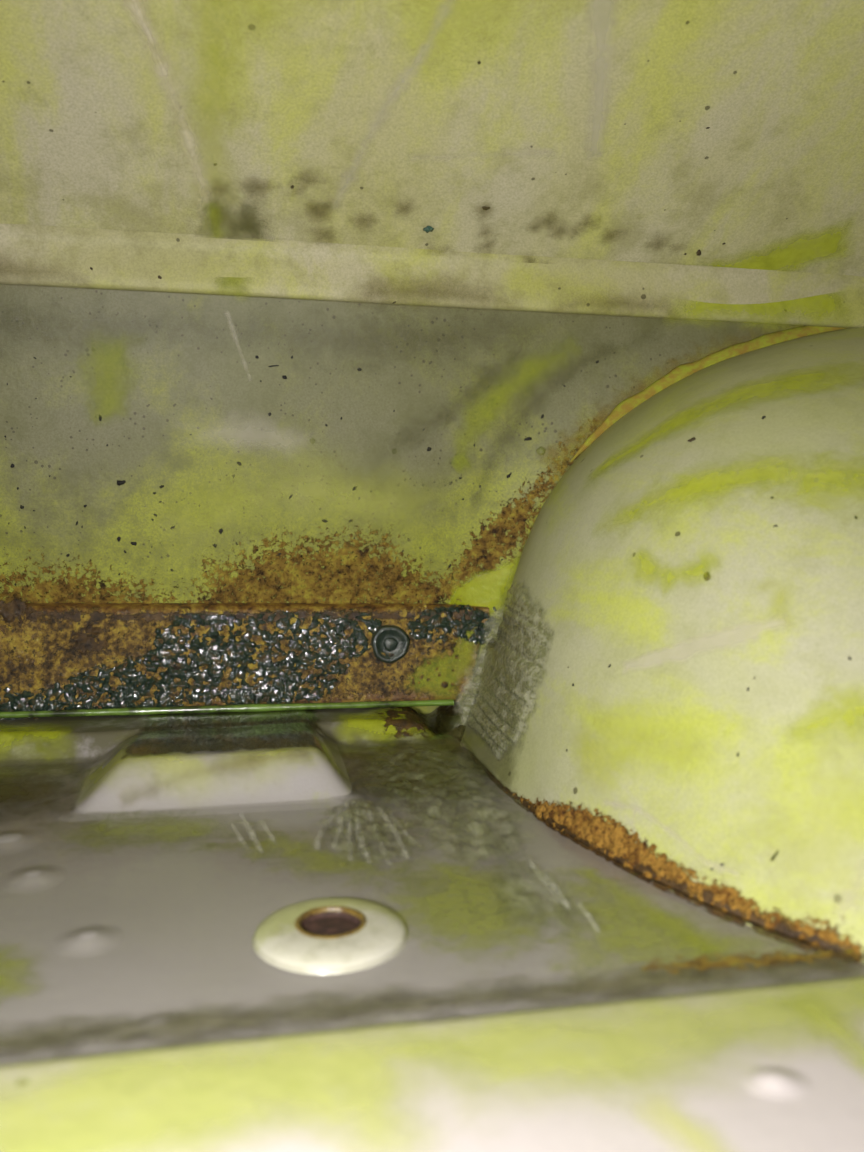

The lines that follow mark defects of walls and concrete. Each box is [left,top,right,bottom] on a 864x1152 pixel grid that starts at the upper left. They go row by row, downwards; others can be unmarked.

corrosion [0,414,608,710]
corrosion [458,738,864,967]